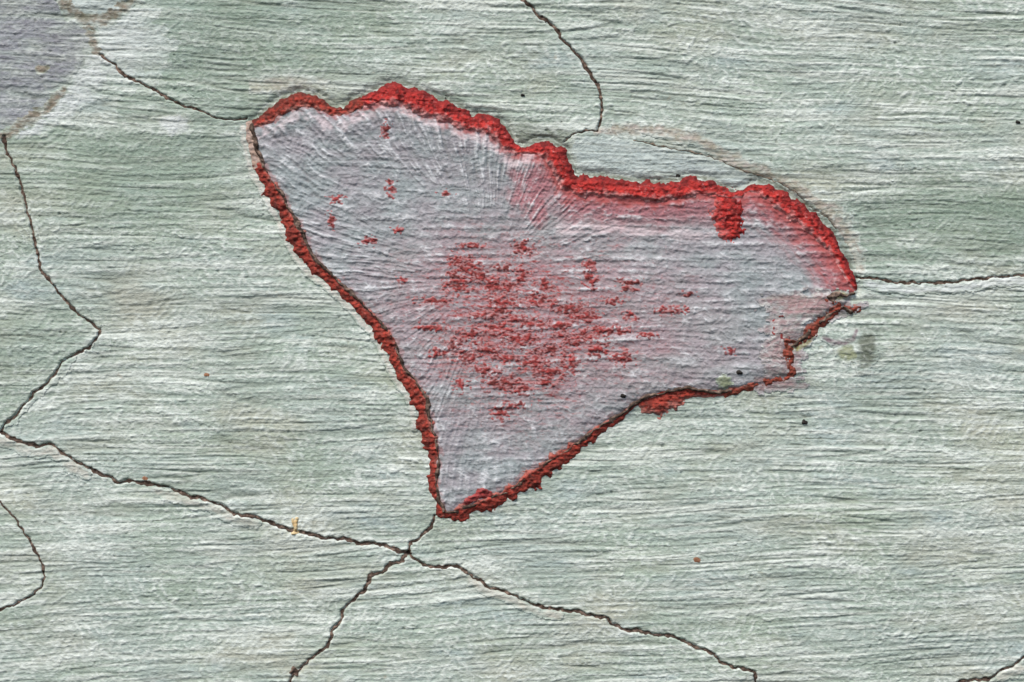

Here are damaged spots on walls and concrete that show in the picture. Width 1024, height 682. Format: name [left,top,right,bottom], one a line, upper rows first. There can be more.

crack [100,54,248,121]
crack [520,0,604,142]
crack [633,140,836,229]
crack [856,274,1024,296]
crack [0,135,758,682]
crack [958,656,1024,682]